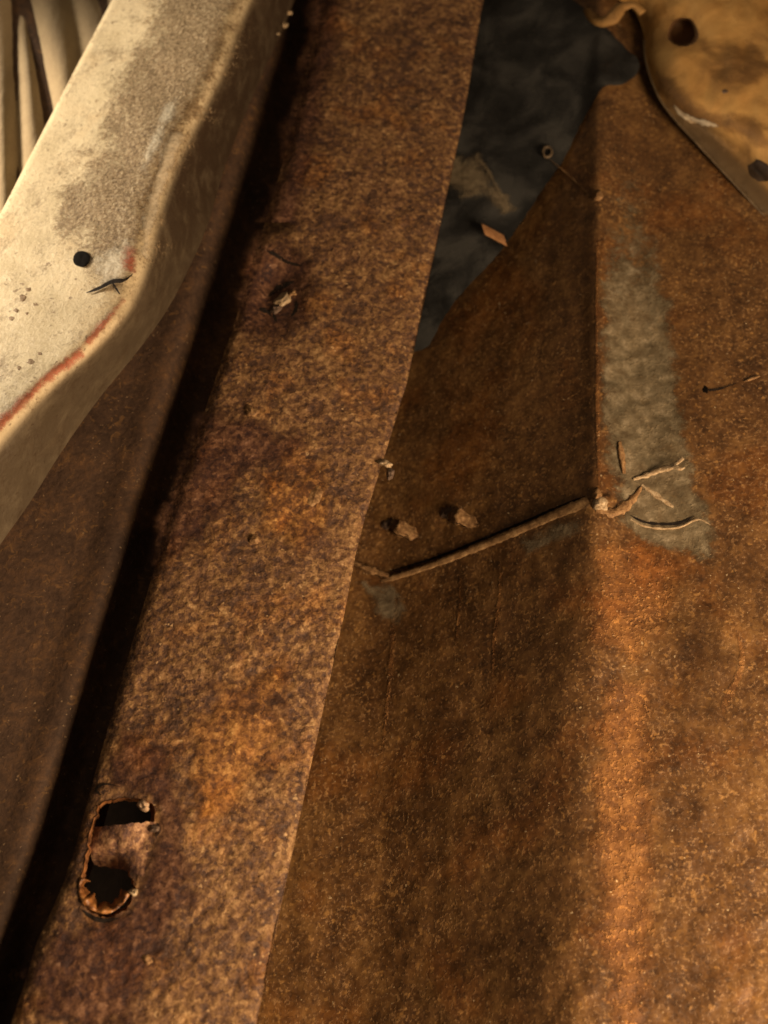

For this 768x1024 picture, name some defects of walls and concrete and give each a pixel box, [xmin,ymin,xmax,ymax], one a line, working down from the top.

corrosion [659,77,766,145]
corrosion [11,0,483,1024]
corrosion [589,541,679,662]
corrosion [590,681,655,1024]